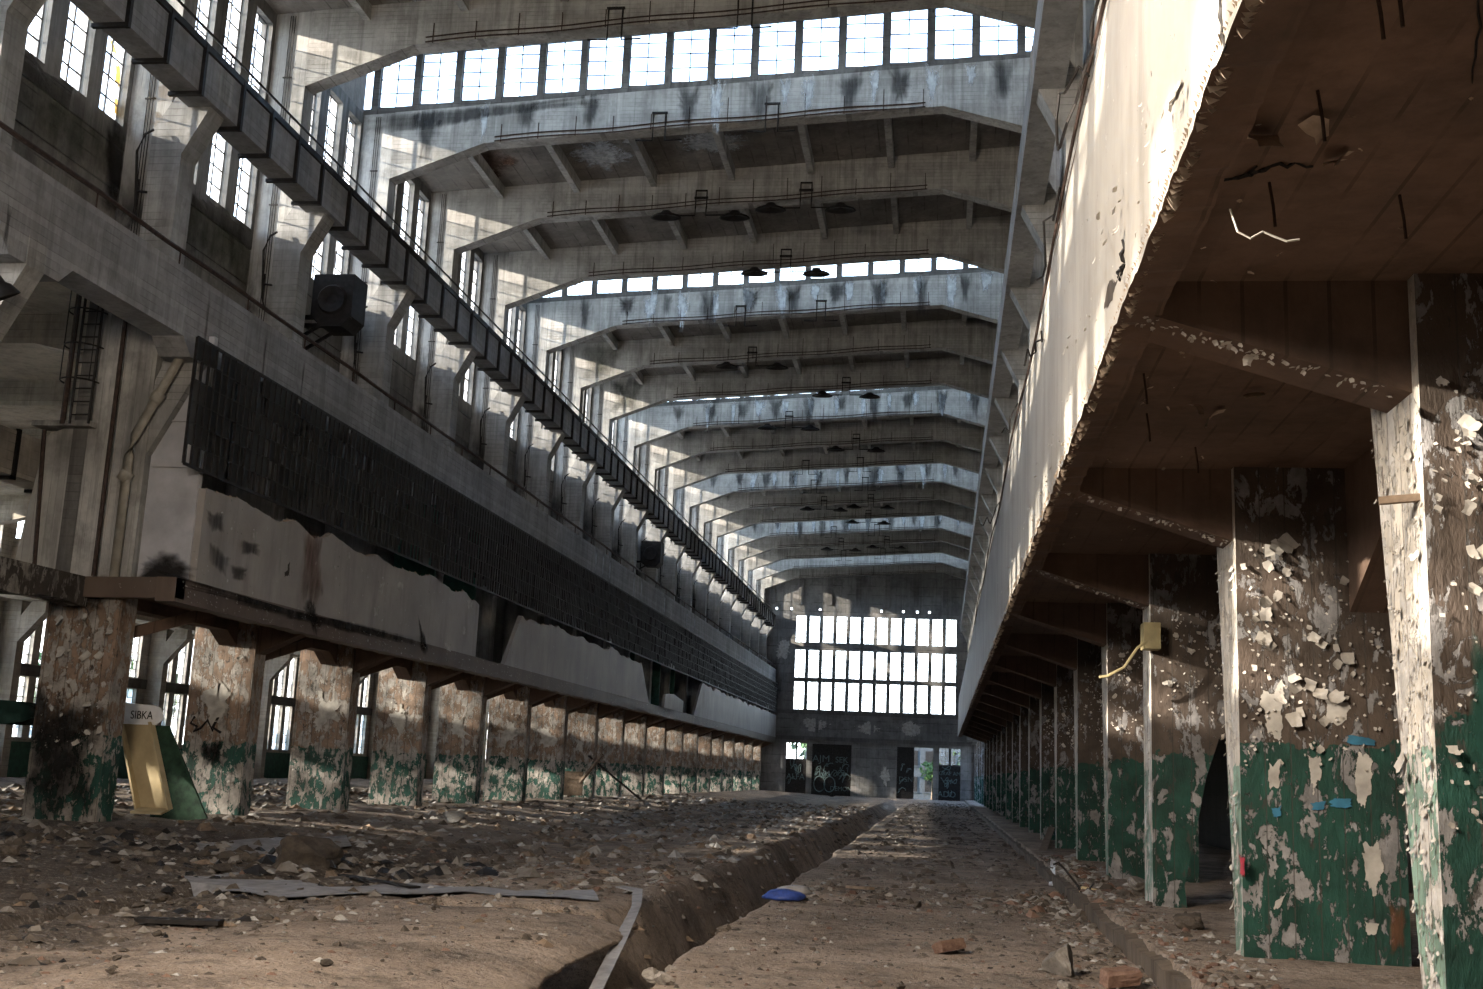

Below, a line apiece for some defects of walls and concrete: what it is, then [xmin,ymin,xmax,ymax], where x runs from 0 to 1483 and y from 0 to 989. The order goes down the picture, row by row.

damp [421,115,434,154]
damp [587,98,598,124]
damp [680,88,746,152]
damp [843,71,908,105]
damp [997,65,1011,93]
spalling [969,0,1483,874]
peeling [291,668,352,805]
peeling [372,682,417,799]
peeling [436,702,593,797]
peeling [1362,837,1384,897]
peeling [1365,922,1379,935]
peeling [1410,886,1441,984]